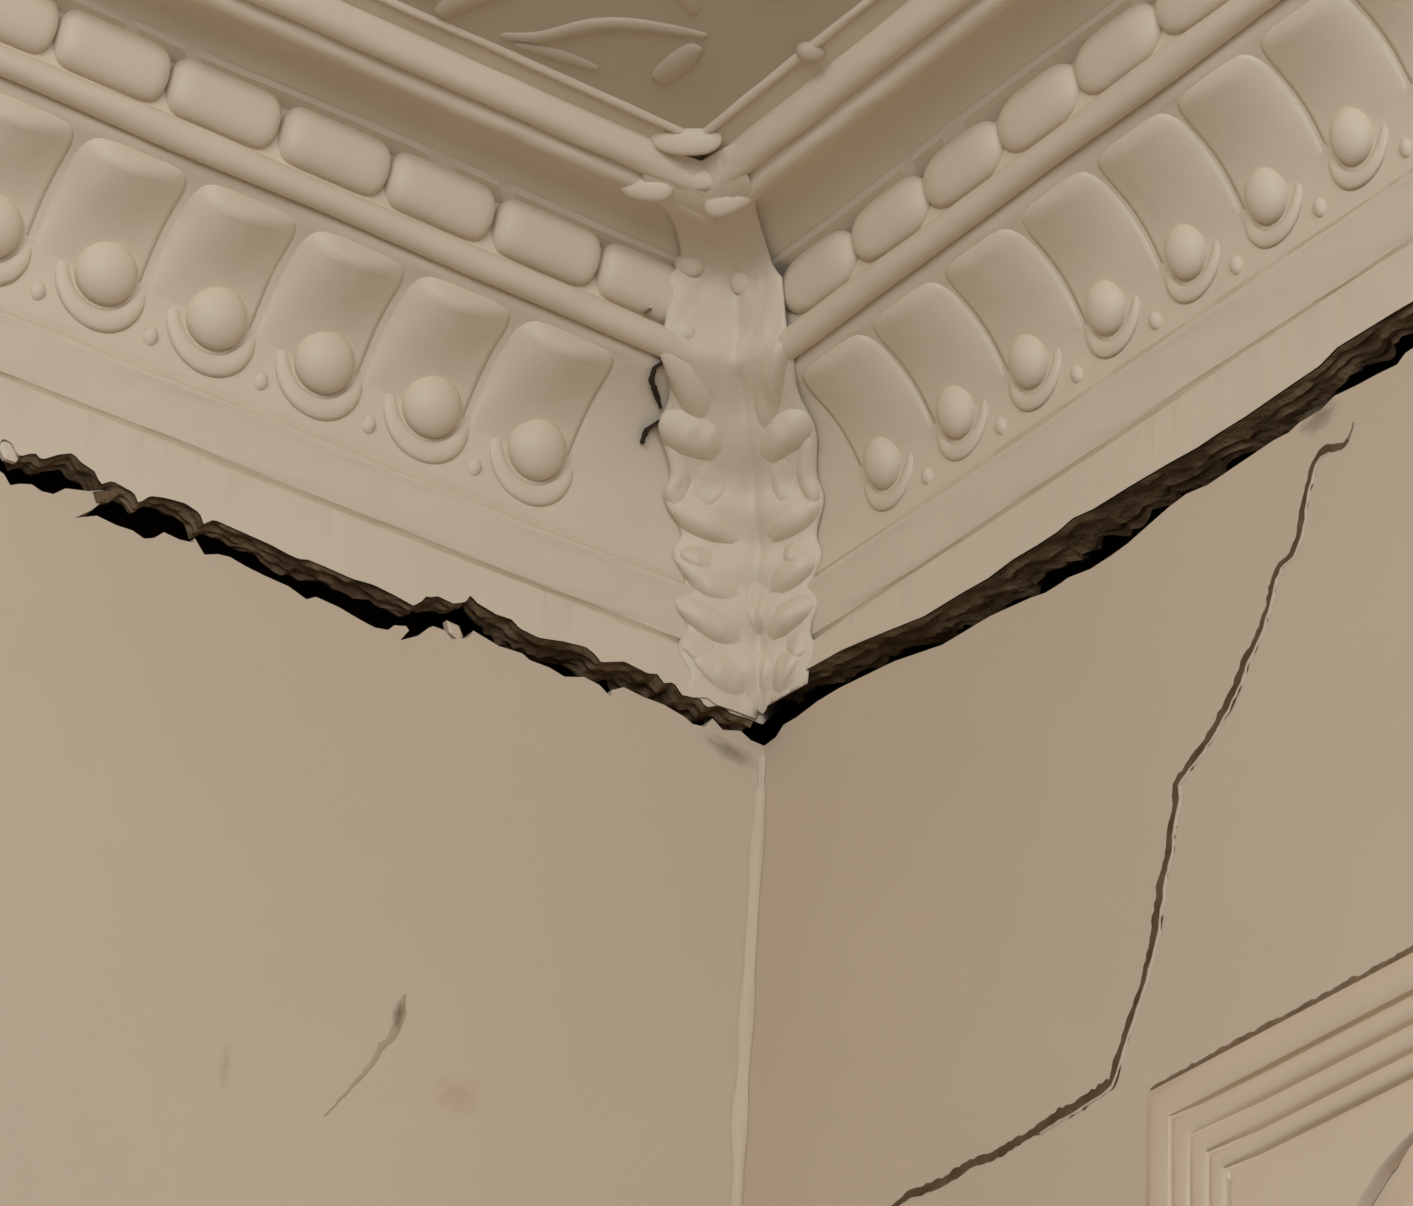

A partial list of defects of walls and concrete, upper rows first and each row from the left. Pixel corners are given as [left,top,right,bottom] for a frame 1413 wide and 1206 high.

crack [0,302,1413,1206]